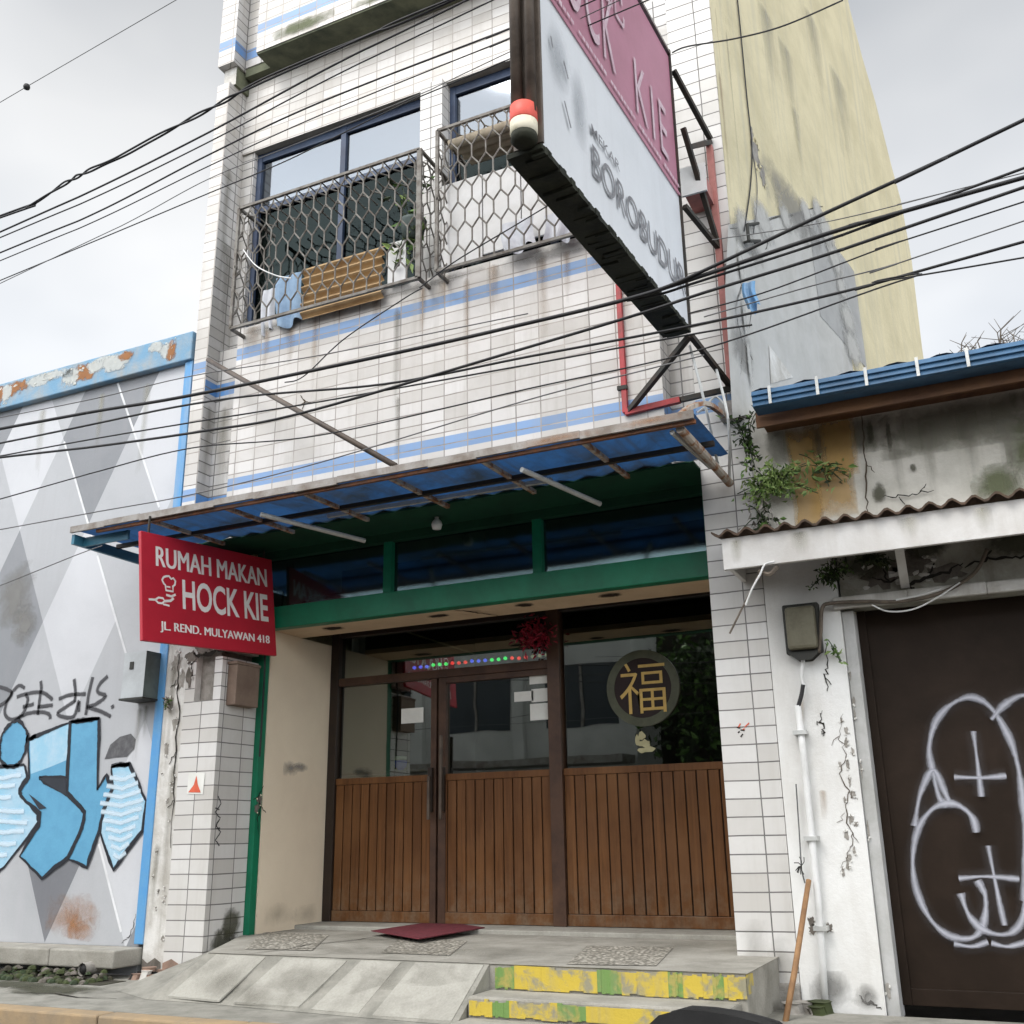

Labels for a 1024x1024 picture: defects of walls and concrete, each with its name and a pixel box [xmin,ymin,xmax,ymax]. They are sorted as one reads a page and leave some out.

peeling [0,351,133,404]
peeling [148,337,176,361]
crack [861,415,934,511]
water stain [982,438,1024,495]
crack [872,550,1024,589]
crack [167,650,224,848]